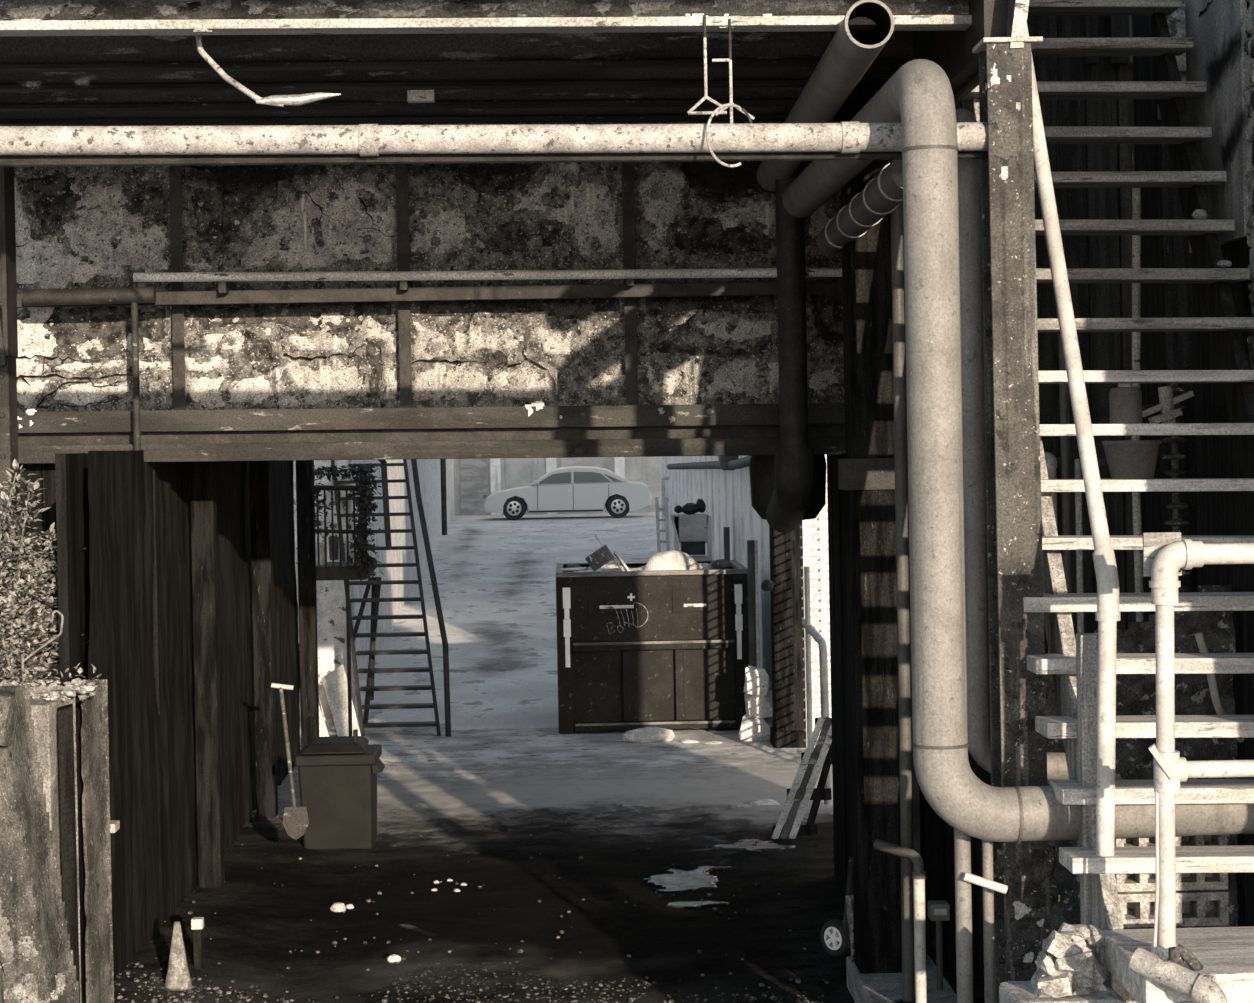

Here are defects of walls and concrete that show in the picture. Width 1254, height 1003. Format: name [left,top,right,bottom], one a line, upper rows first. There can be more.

spalling [9,1,105,21]
spalling [212,0,277,14]
spalling [364,0,445,9]
peeling [190,24,212,32]
damp [418,163,530,178]
spalling [0,897,65,1003]